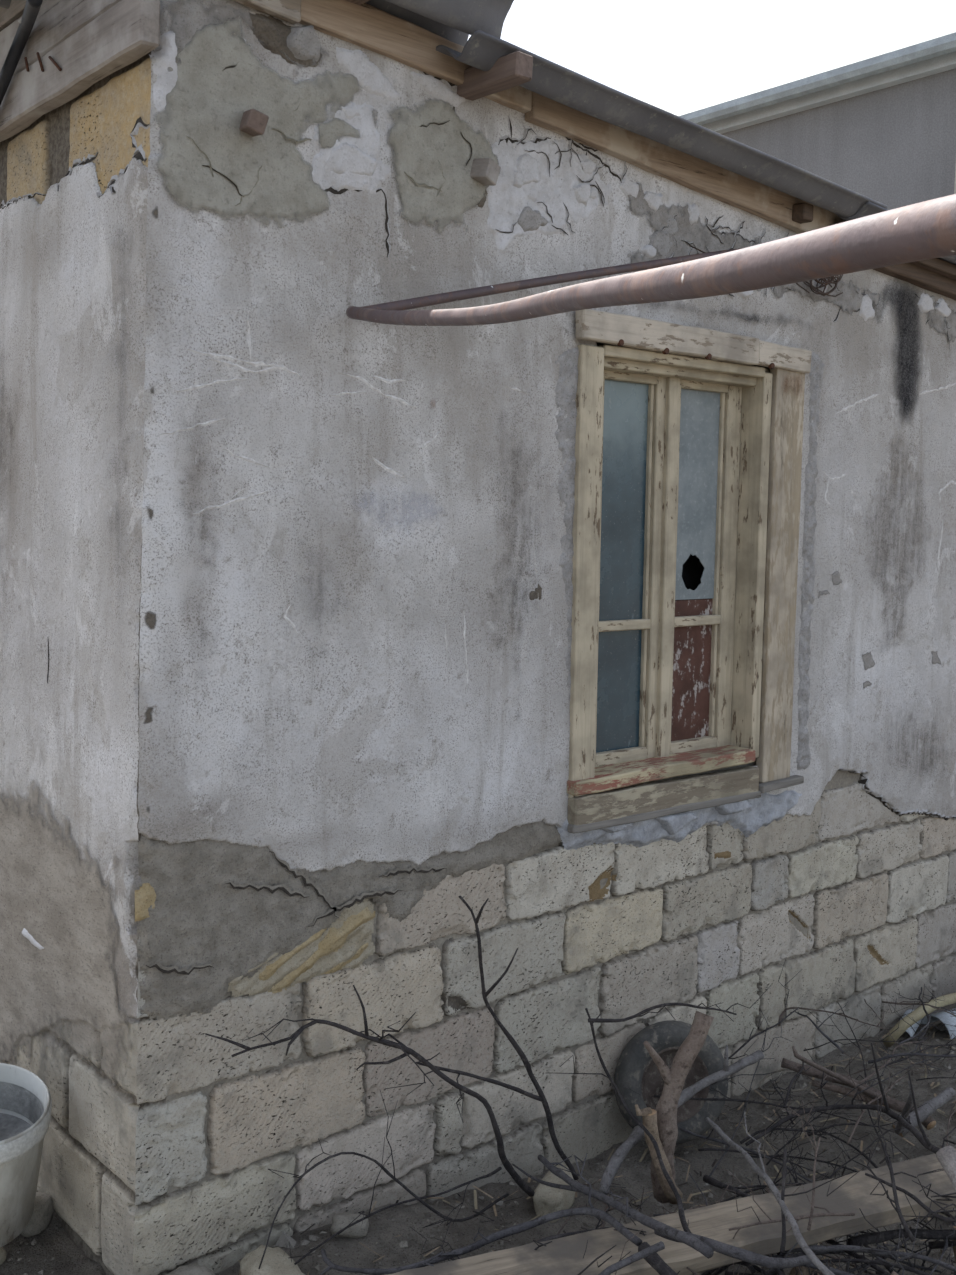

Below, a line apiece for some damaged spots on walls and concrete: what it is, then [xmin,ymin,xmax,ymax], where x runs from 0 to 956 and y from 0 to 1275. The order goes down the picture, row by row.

peeling [149,0,400,194]
peeling [410,72,465,107]
crack [498,116,622,183]
peeling [477,128,765,272]
peeling [729,279,880,321]
peeling [917,293,956,351]
spalling [554,347,579,701]